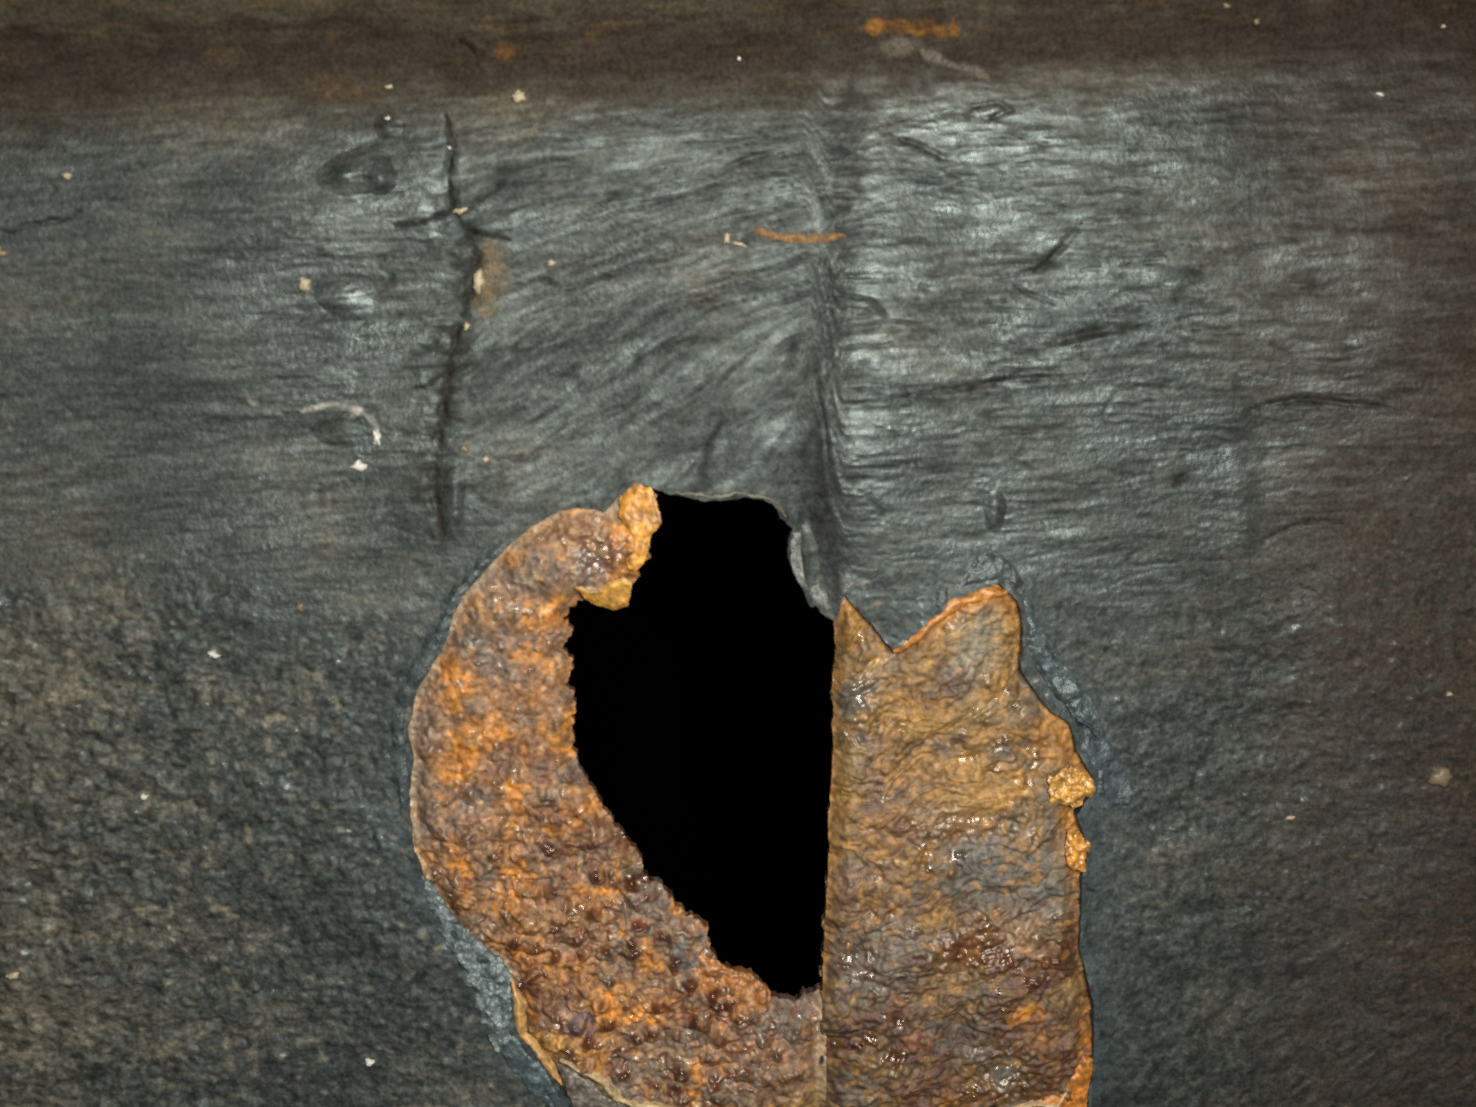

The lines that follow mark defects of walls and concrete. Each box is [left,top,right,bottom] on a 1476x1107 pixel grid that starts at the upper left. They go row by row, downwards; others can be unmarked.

crack [394,114,512,437]
peeling [667,491,832,614]
rust [408,483,1096,1107]